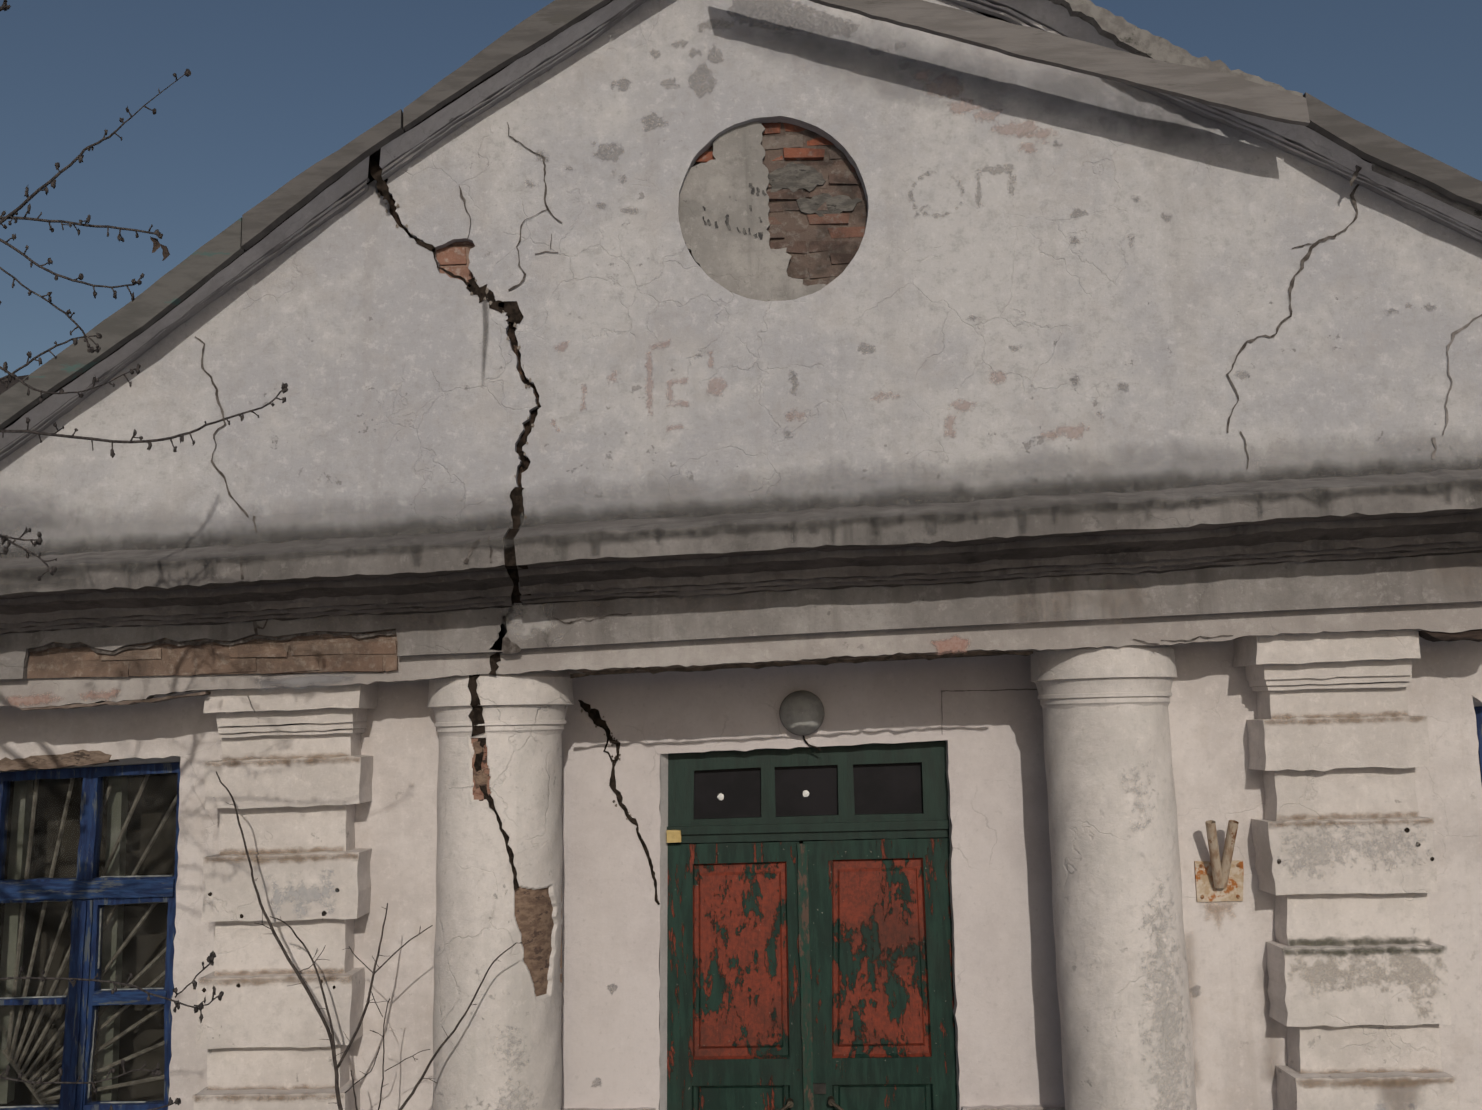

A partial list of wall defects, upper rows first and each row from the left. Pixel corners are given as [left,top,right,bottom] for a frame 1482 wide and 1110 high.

flaking render [693,145,715,166]
flaking render [761,122,867,286]
crack [1226,158,1365,469]
crack [195,336,257,579]
crack [369,122,632,890]
crack [1432,314,1482,459]
flaking render [20,629,398,711]
flaking render [1418,629,1482,642]
flaking render [0,750,119,771]
crack [578,700,660,905]
flaking render [515,886,562,996]